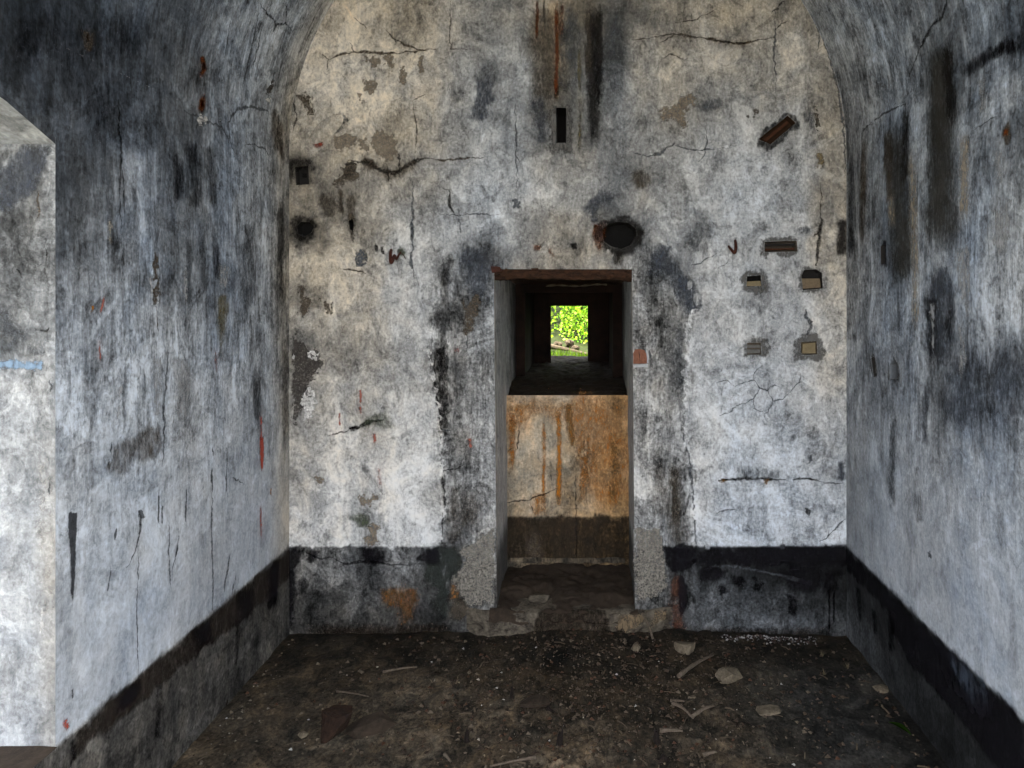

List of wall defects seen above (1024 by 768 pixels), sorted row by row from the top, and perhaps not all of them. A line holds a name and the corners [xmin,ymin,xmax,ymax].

crack [322,1,467,68]
corrosion [536,3,563,91]
crack [631,1,787,92]
crack [345,94,484,277]
hole [596,216,643,260]
leakage [432,251,492,424]
crack [329,414,387,436]
corrosion [536,397,629,510]
crack [716,368,801,418]
crack [718,471,841,485]
peeling [71,332,447,759]
peeling [662,308,1024,768]